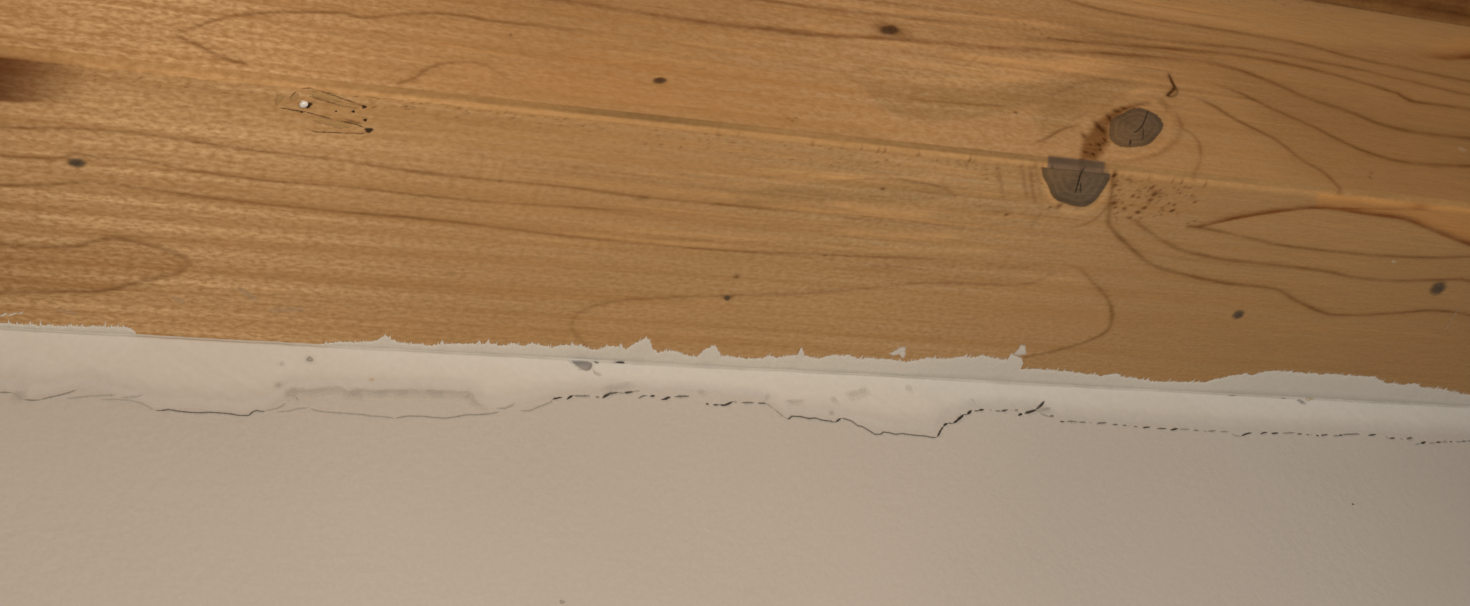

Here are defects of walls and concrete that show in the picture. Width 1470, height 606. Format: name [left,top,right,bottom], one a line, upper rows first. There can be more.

crack [0,389,1470,445]